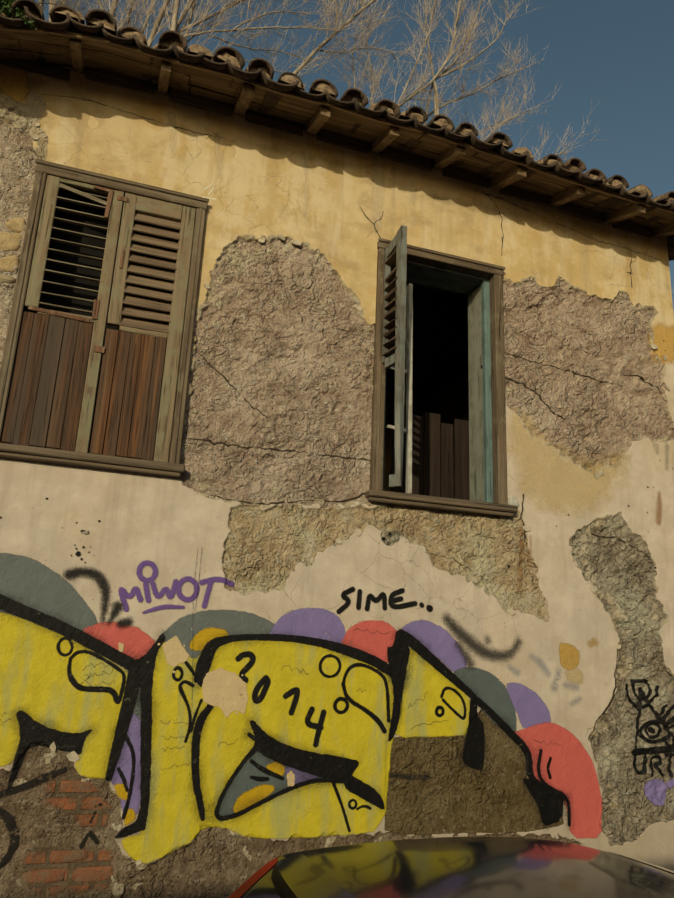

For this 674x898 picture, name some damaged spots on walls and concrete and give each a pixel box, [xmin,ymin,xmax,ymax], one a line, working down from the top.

crack [42,94,225,139]
flaking render [0,91,48,368]
crack [472,188,661,288]
crack [197,352,267,418]
crack [185,438,370,461]
flaking render [174,234,550,622]
crack [504,352,665,420]
flaking render [503,276,674,479]
crack [210,493,365,508]
flaking render [569,511,674,846]
flaking render [0,742,442,898]
flaking render [453,833,586,846]